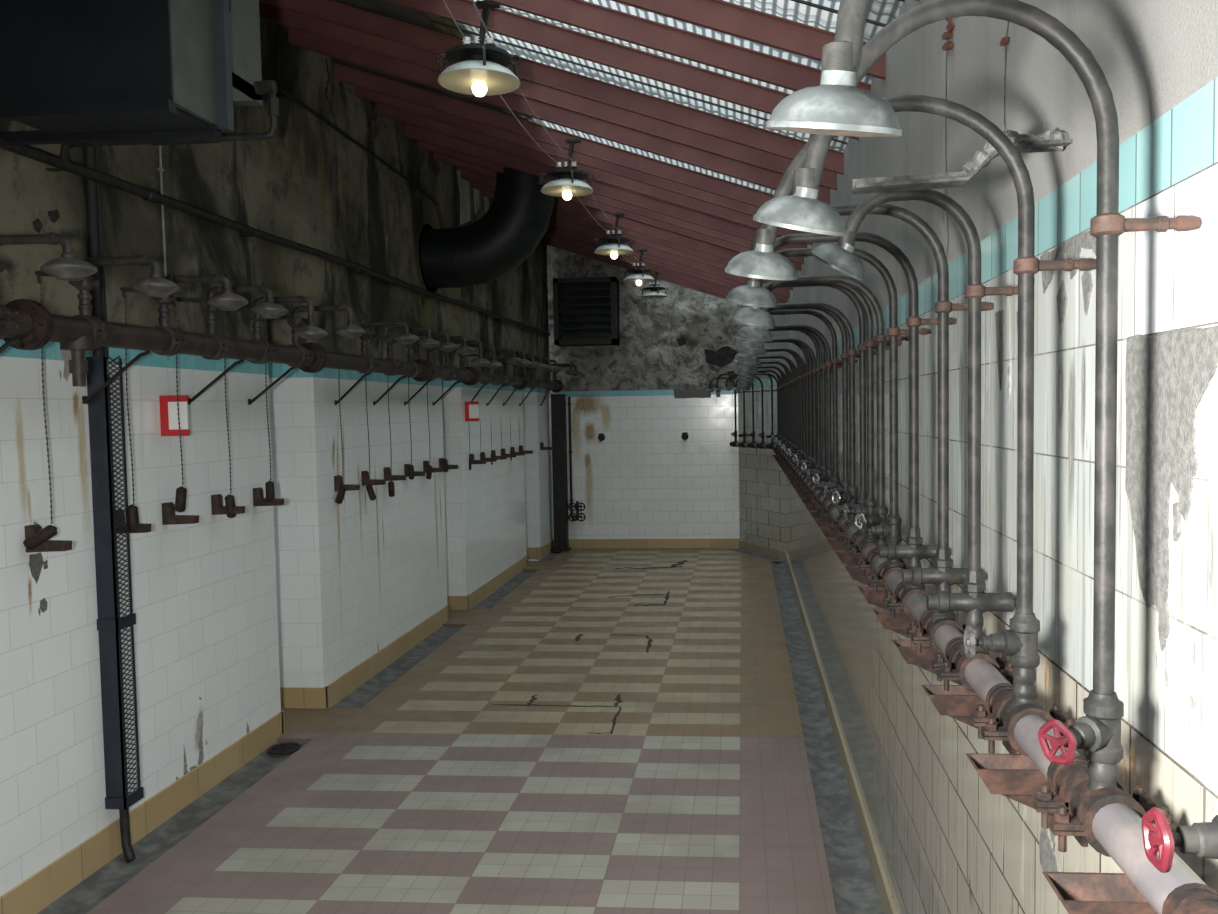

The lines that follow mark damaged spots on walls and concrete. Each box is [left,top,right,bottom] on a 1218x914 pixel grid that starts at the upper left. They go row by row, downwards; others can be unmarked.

rust [574,397,607,439]
spalling [1125,325,1218,695]
spalling [29,553,48,584]
crack [492,694,622,734]
spalling [1039,828,1060,872]